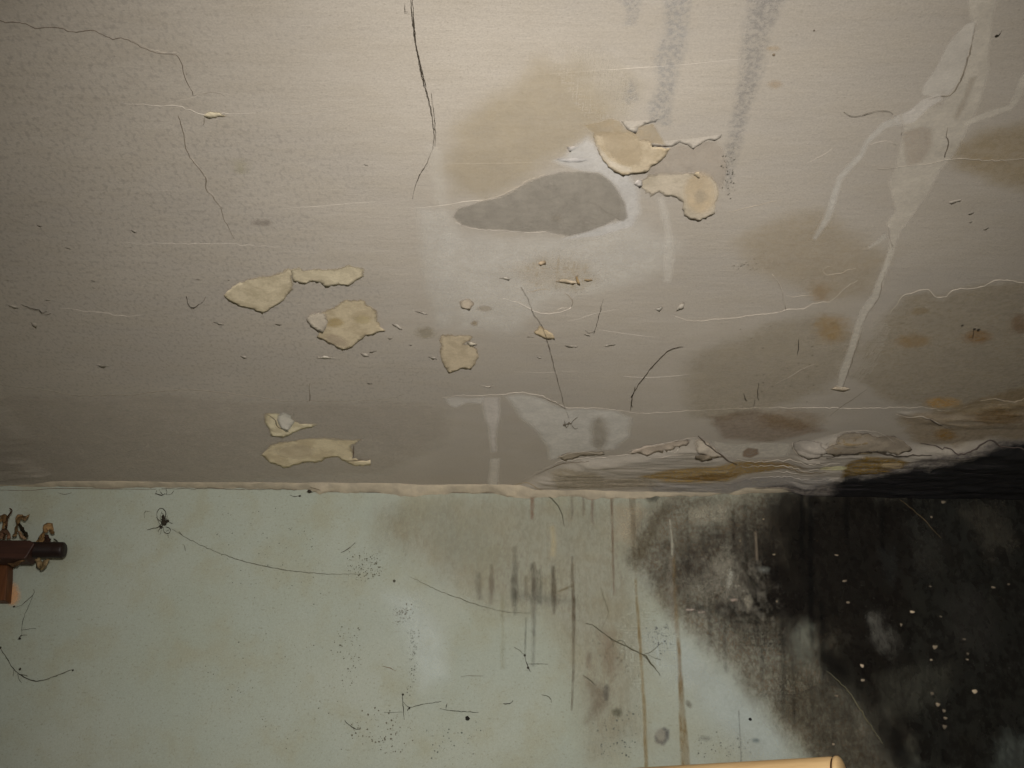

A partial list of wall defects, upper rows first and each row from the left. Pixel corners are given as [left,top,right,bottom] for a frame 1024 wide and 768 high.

crack [0,20,224,96]
crack [178,116,234,238]
flaking render [454,119,727,237]
peeling [224,266,363,314]
peeling [307,300,385,359]
peeling [440,335,479,373]
peeling [262,413,371,468]
damp [394,284,1024,768]